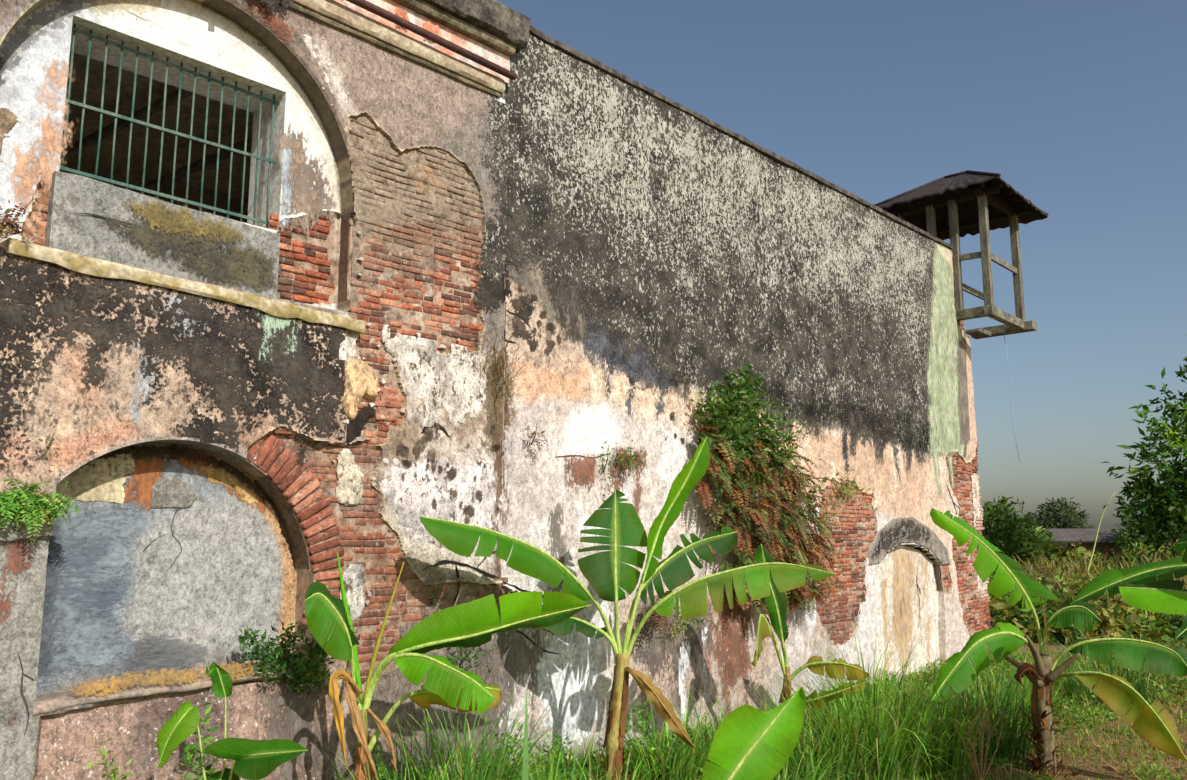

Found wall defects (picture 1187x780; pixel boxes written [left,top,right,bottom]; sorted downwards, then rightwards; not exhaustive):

peeling [0,107,22,162]
damp [100,217,278,291]
peeling [55,453,137,504]
crack [143,508,183,571]
damp [0,247,353,501]
peeling [200,464,259,504]
flaking render [246,114,516,685]
damp [474,261,697,418]
flaking render [813,478,877,646]
damp [840,411,863,472]
damp [873,337,970,497]
flaking render [940,443,992,657]